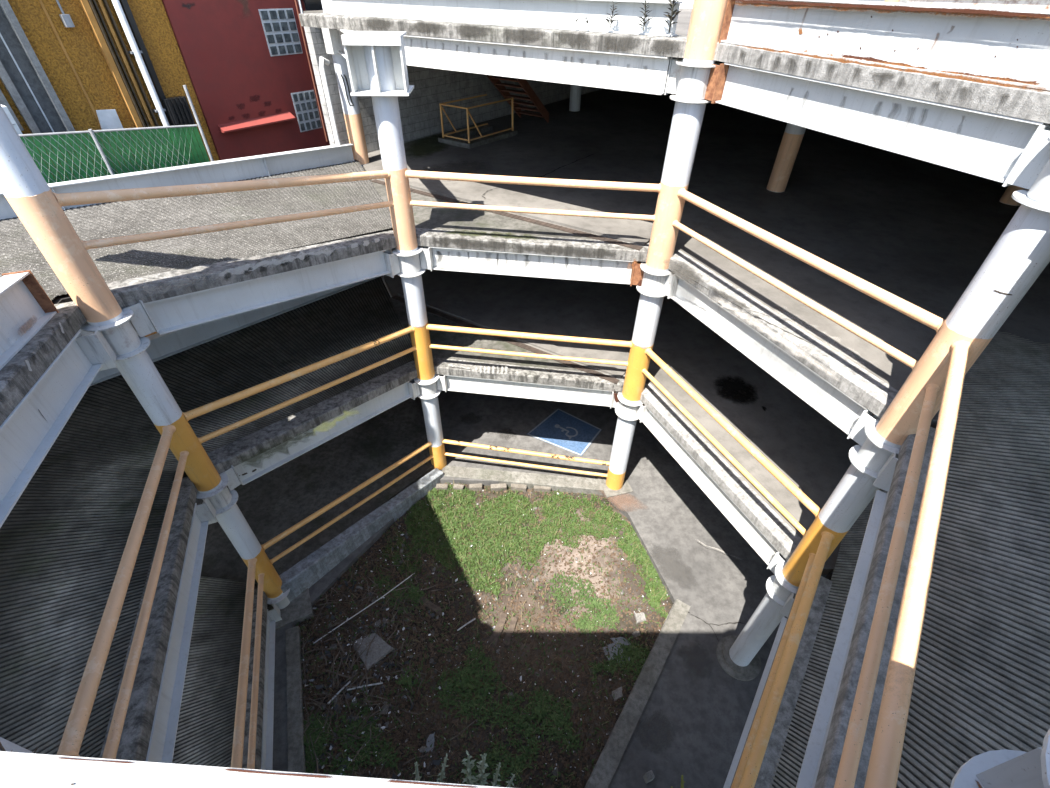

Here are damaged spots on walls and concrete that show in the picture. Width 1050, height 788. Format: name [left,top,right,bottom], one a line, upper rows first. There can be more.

corrosion [729,0,1050,27]
damp [368,17,389,30]
damp [411,20,441,32]
damp [457,24,487,47]
damp [506,28,542,42]
damp [560,30,588,61]
damp [605,35,637,51]
damp [653,40,678,53]
corrosion [734,42,1045,92]
corrosion [224,769,333,779]